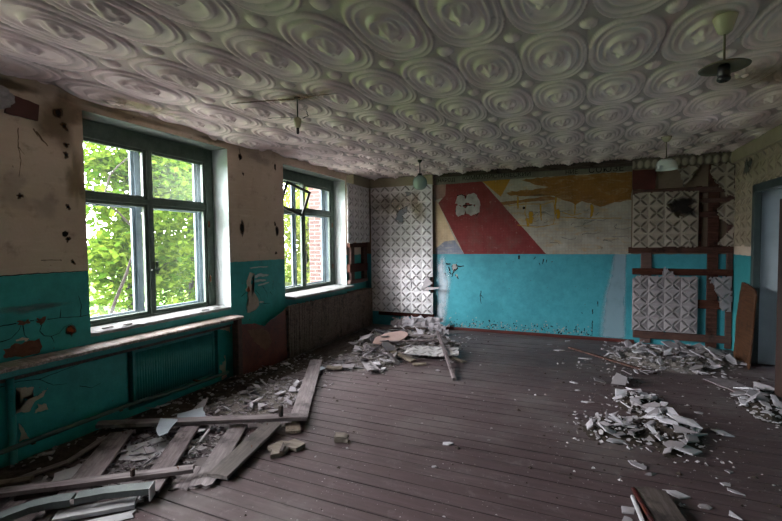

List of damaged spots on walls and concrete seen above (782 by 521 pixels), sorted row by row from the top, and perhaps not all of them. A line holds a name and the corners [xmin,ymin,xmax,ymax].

crack [17,128,48,175]
peeling [245,272,259,313]
peeling [448,317,593,336]
spalling [1,337,43,360]
peeling [16,387,49,443]